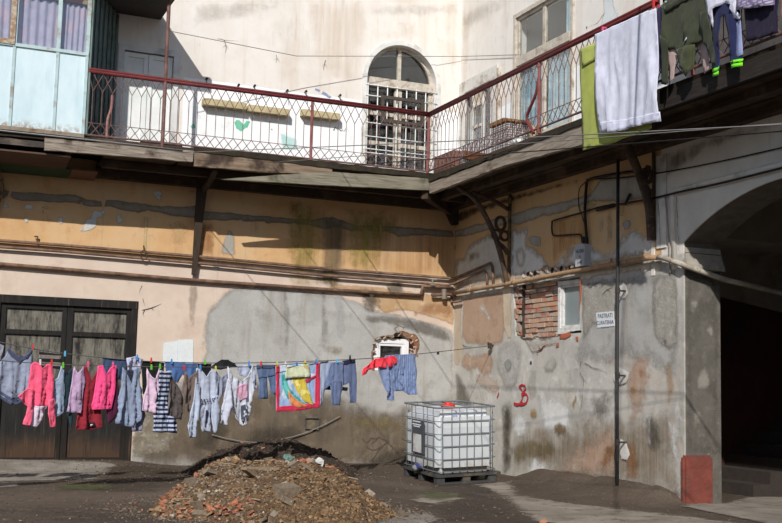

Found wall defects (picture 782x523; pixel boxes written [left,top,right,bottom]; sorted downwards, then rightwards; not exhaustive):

peeling [80,210,105,231]
peeling [222,231,234,254]
leakage [323,221,343,285]
peeling [456,206,665,312]
peeling [330,285,454,324]
spalling [371,329,420,370]
peeling [462,354,499,392]
leakage [504,397,678,486]